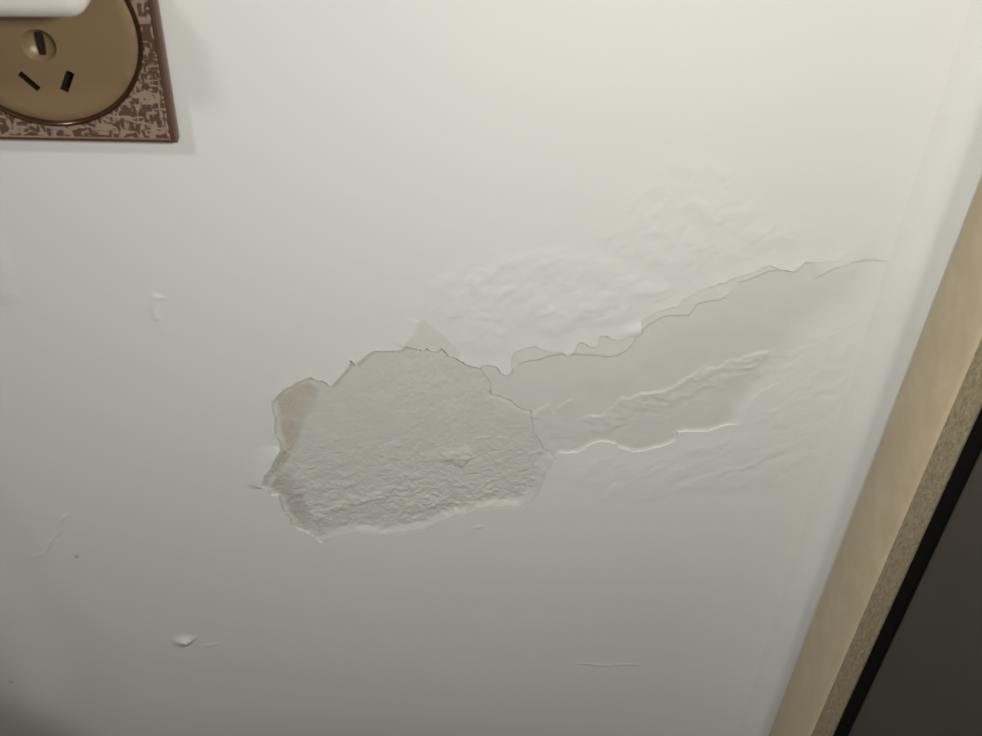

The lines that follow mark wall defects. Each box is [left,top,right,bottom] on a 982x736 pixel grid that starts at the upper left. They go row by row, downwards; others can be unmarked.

flaking render [241,226,892,546]